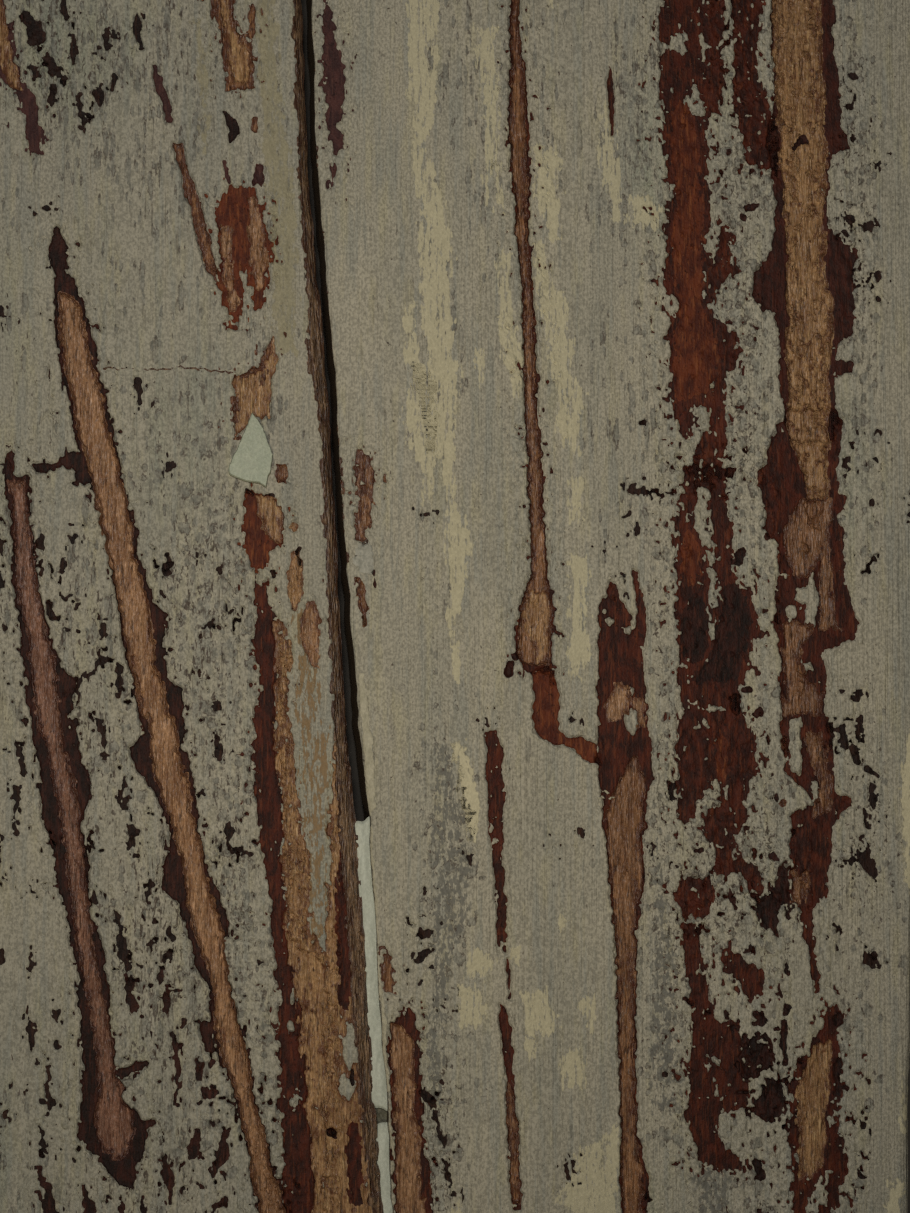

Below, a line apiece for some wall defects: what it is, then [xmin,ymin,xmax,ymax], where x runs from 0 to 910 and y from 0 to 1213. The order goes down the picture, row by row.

peeling [0,0,154,158]
spalling [152,65,173,123]
peeling [197,0,268,99]
peeling [314,0,357,204]
spalling [0,111,372,1213]
peeling [340,438,387,627]
spalling [497,0,891,1213]
peeling [359,673,464,1213]
spalling [475,707,523,1211]